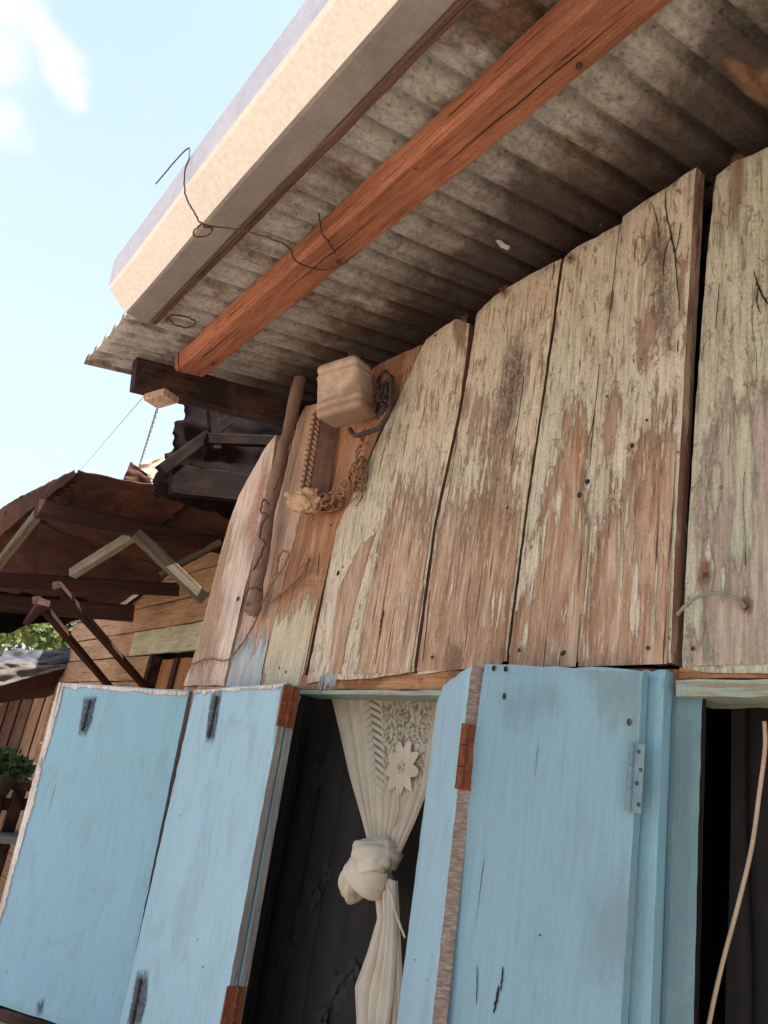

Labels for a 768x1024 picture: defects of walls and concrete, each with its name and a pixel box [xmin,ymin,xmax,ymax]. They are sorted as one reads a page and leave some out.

peeling [635,292,664,372]
crack [652,190,682,310]
crack [754,271,768,313]
peeling [318,377,678,696]
peeling [682,377,768,666]
peeling [0,593,318,921]